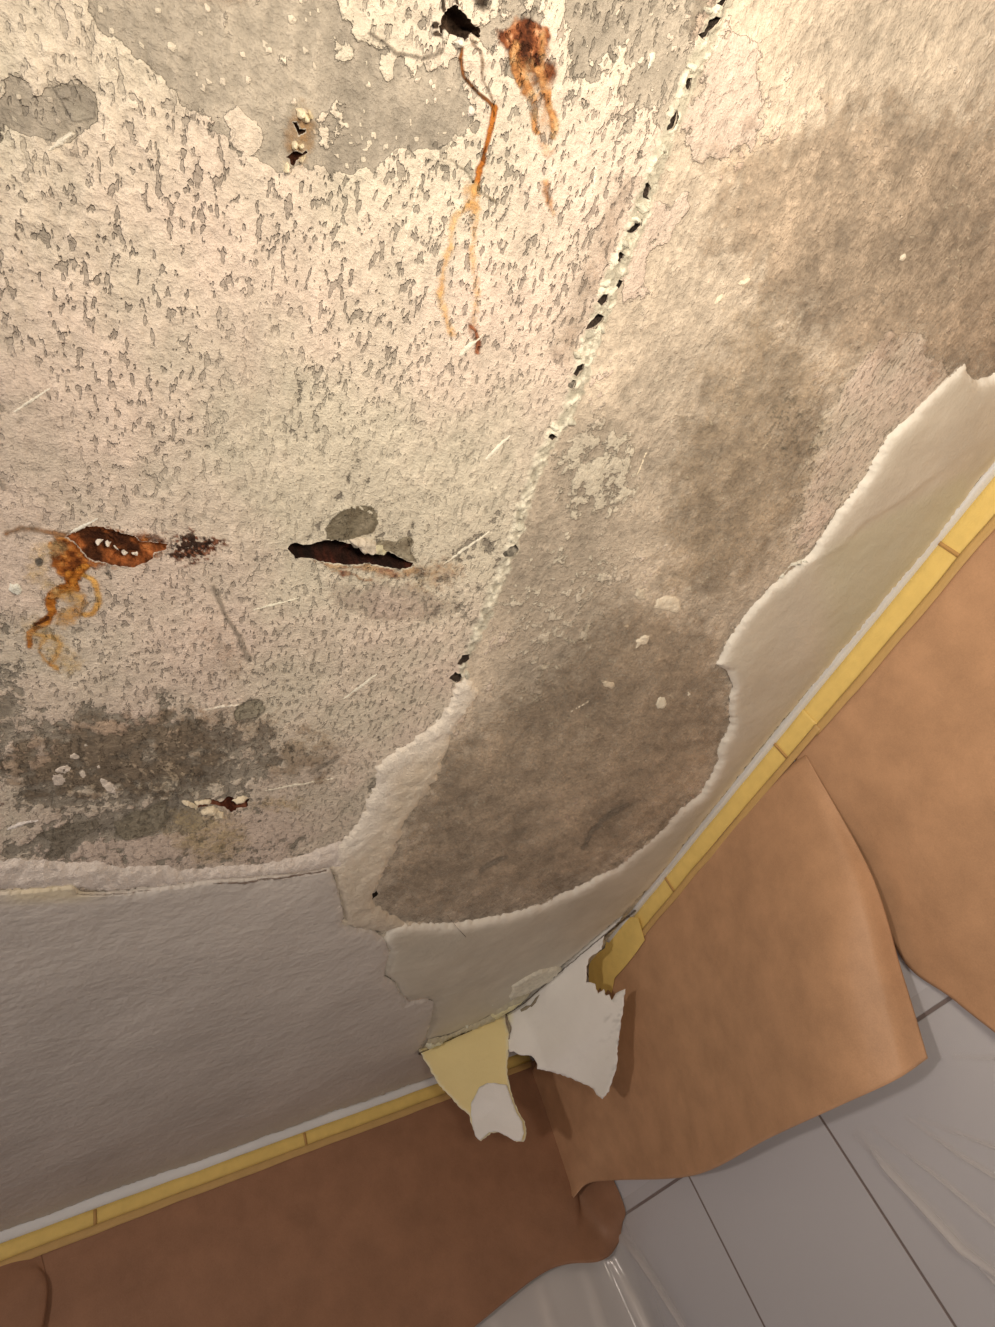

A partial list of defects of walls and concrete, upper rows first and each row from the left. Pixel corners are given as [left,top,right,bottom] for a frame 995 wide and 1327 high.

crack [370,32,443,59]
corrosion [445,44,498,260]
corrosion [498,18,559,139]
crack [449,0,735,684]
leakage [715,90,995,383]
corrosion [5,527,106,670]
corrosion [107,527,226,564]
leakage [668,316,825,589]
crack [777,559,808,582]
leakage [0,710,264,799]
peeling [0,364,995,1231]
leakage [383,603,726,919]